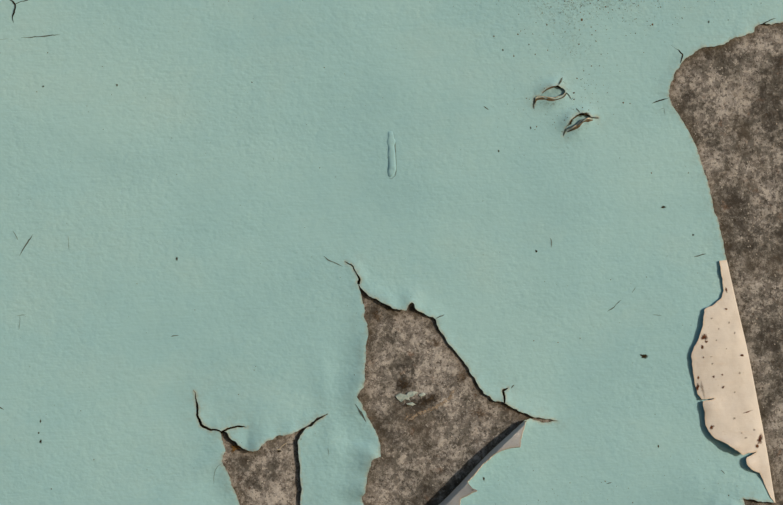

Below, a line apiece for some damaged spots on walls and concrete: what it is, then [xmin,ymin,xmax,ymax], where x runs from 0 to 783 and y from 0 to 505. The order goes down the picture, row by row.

crack [10,0,52,38]
peeling [195,392,327,505]
peeling [324,256,556,505]
peeling [653,18,783,505]